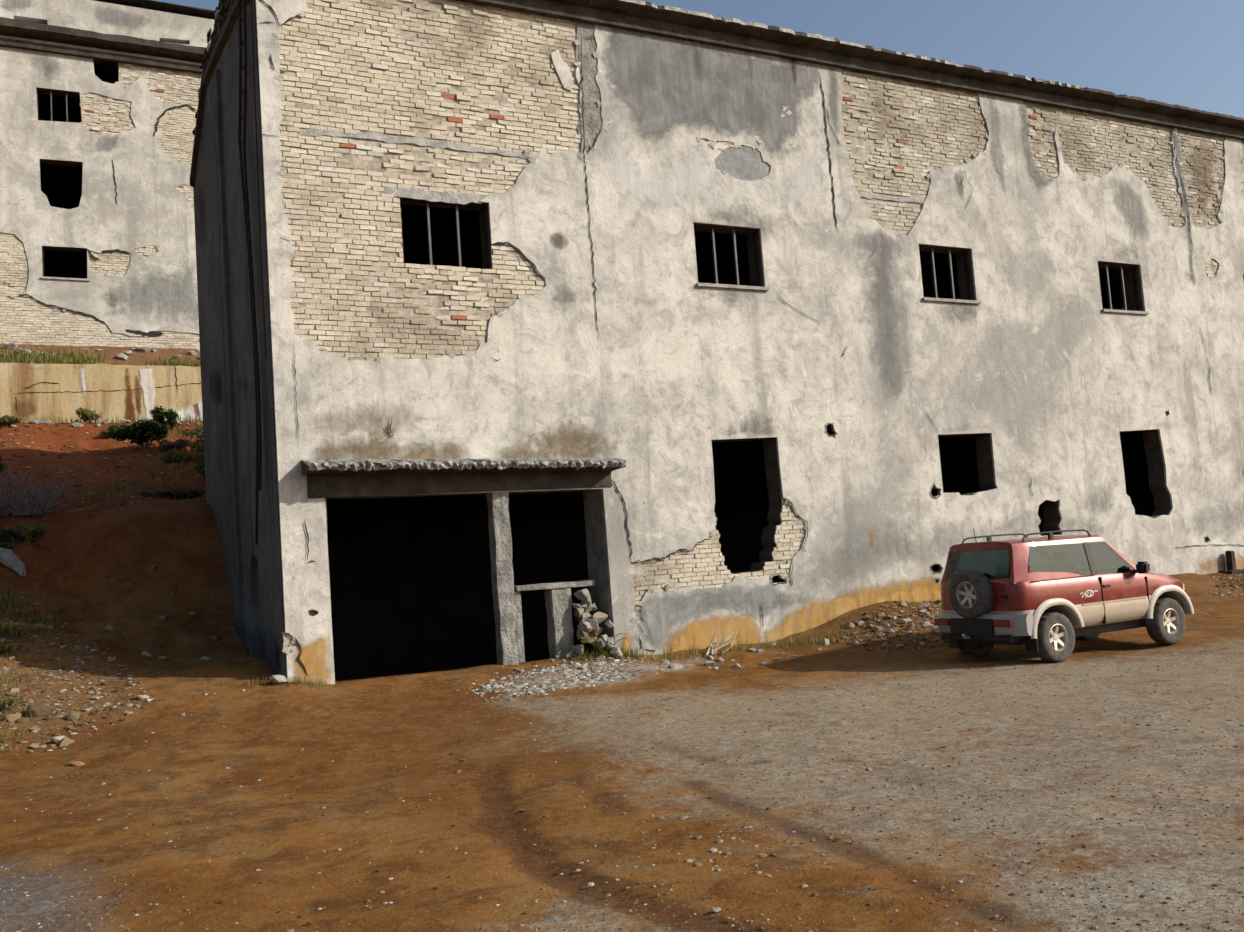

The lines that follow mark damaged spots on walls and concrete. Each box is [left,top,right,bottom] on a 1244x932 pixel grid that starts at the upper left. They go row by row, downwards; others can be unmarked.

flaking render [80,63,203,165]
flaking render [273,0,608,364]
crack [580,37,602,342]
damp [603,29,838,153]
flaking render [696,136,770,182]
crack [820,80,840,229]
flaking render [841,70,992,237]
flaking render [1023,102,1229,230]
flaking render [0,232,200,351]
damp [140,369,218,421]
flaking render [625,486,811,654]
damp [642,578,941,653]